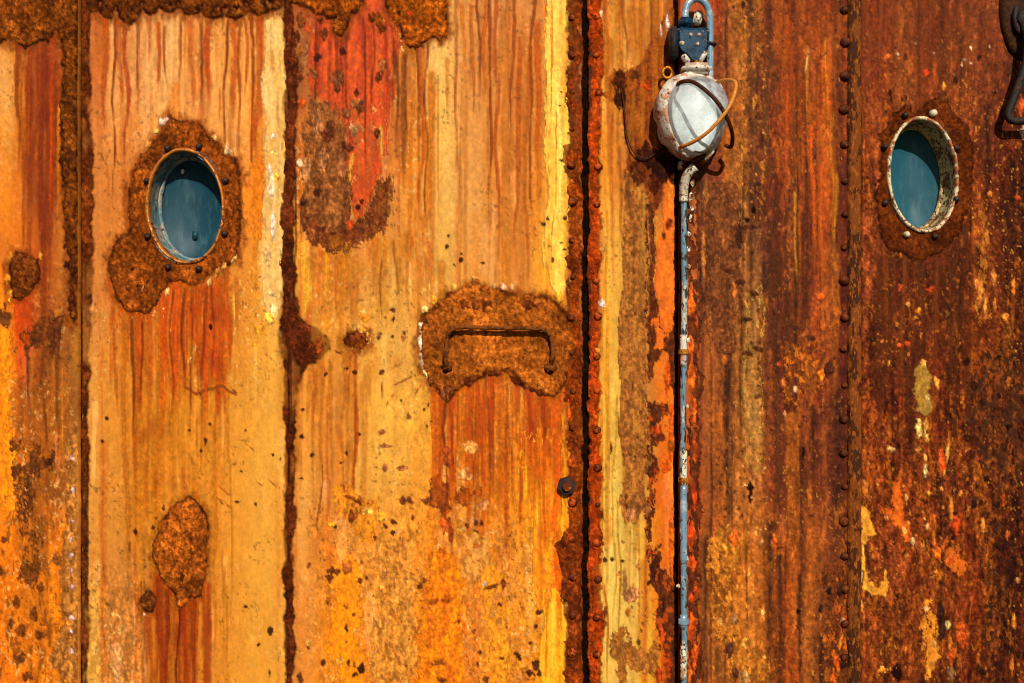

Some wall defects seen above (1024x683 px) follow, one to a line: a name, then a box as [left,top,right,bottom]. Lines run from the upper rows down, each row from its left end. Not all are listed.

rust [0,0,671,683]
peeling [602,8,675,683]
rust [678,176,705,683]
rust [760,3,836,506]
rust [819,563,848,683]
rust [874,89,1024,653]